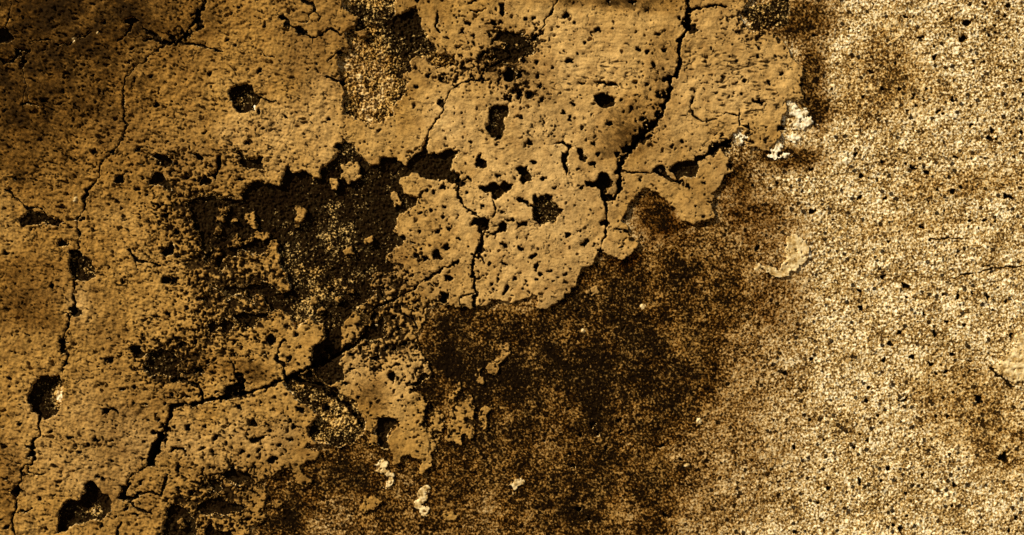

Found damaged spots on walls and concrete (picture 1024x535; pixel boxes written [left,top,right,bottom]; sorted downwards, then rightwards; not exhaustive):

crack [69,0,224,253]
crack [278,0,345,86]
flaking render [337,0,544,146]
spalling [553,141,614,201]
crack [597,0,757,253]
spalling [652,160,711,189]
flaking render [129,140,568,535]
crack [368,176,500,328]
damp [250,0,830,535]
crack [8,414,45,535]
crack [115,338,364,535]
damp [922,371,1022,473]